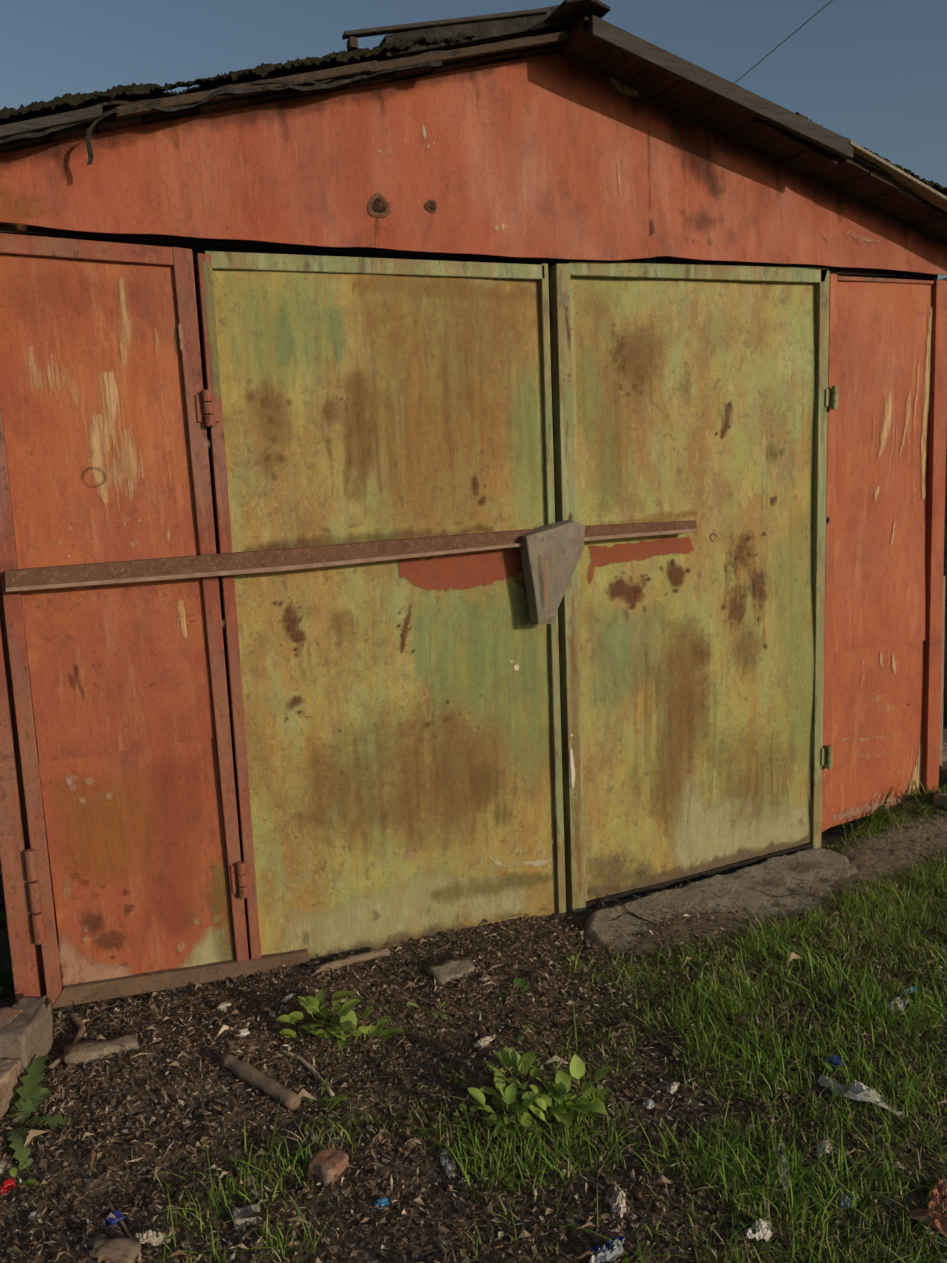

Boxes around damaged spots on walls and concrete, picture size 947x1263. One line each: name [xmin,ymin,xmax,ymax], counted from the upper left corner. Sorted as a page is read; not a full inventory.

peeling [90,278,143,516]
rust [716,403,732,438]
peeling [879,308,933,499]
rust [274,601,305,655]
rust [398,605,415,653]
rust [85,914,123,948]
crack [604,894,655,929]